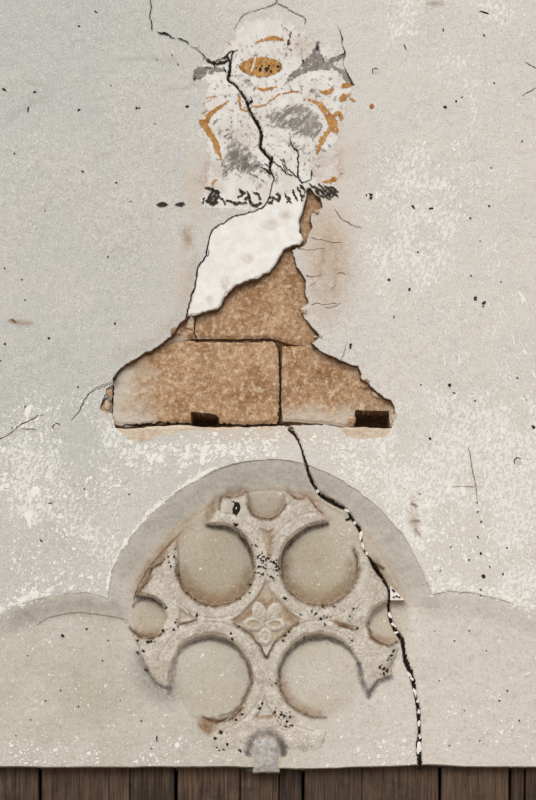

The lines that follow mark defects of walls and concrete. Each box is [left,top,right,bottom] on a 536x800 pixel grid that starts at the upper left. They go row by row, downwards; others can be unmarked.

crack [149,0,313,320]
crack [72,374,116,419]
flaking render [0,188,536,614]
crack [277,421,423,770]